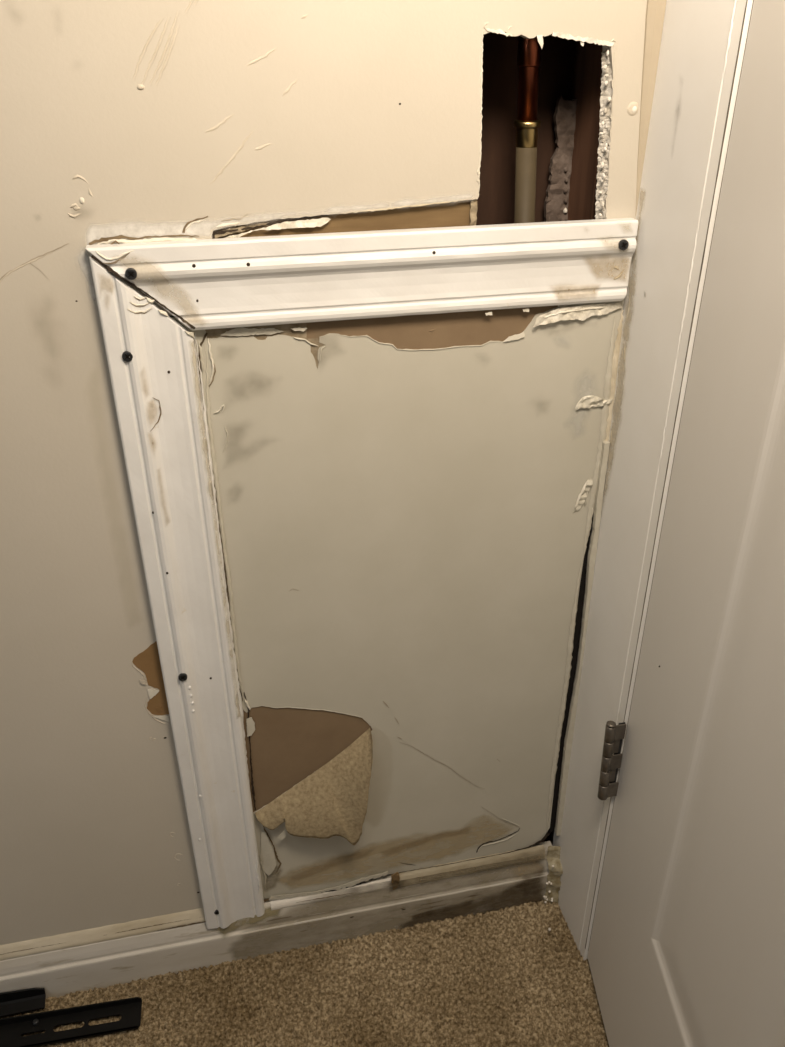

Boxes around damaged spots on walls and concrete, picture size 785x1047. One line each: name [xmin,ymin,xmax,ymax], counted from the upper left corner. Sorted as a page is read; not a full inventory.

peeling [131,641,170,724]
crack [264,507,594,902]